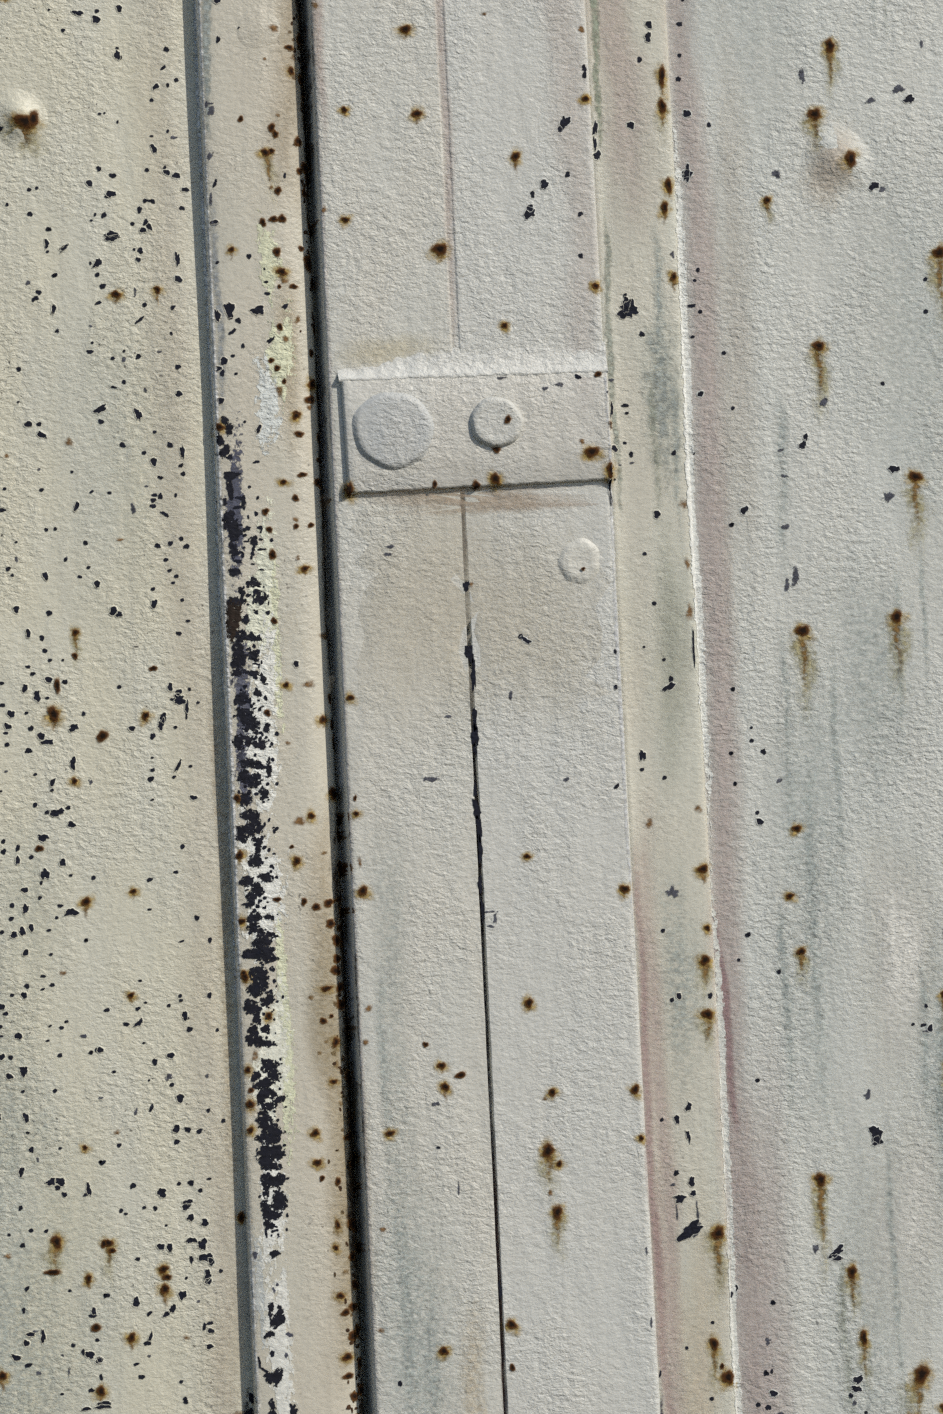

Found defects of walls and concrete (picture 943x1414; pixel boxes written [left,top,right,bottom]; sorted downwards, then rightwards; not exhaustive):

corrosion [822,38,840,84]
corrosion [5,110,39,144]
corrosion [842,150,859,170]
peeling [84,166,155,305]
peeling [210,254,270,376]
peeling [0,605,85,753]
peeling [127,681,200,801]
peeling [215,396,289,1259]
corrosion [302,787,372,1414]
corrosion [812,1172,831,1240]
peeling [258,1283,299,1414]
corrosion [905,1365,934,1414]